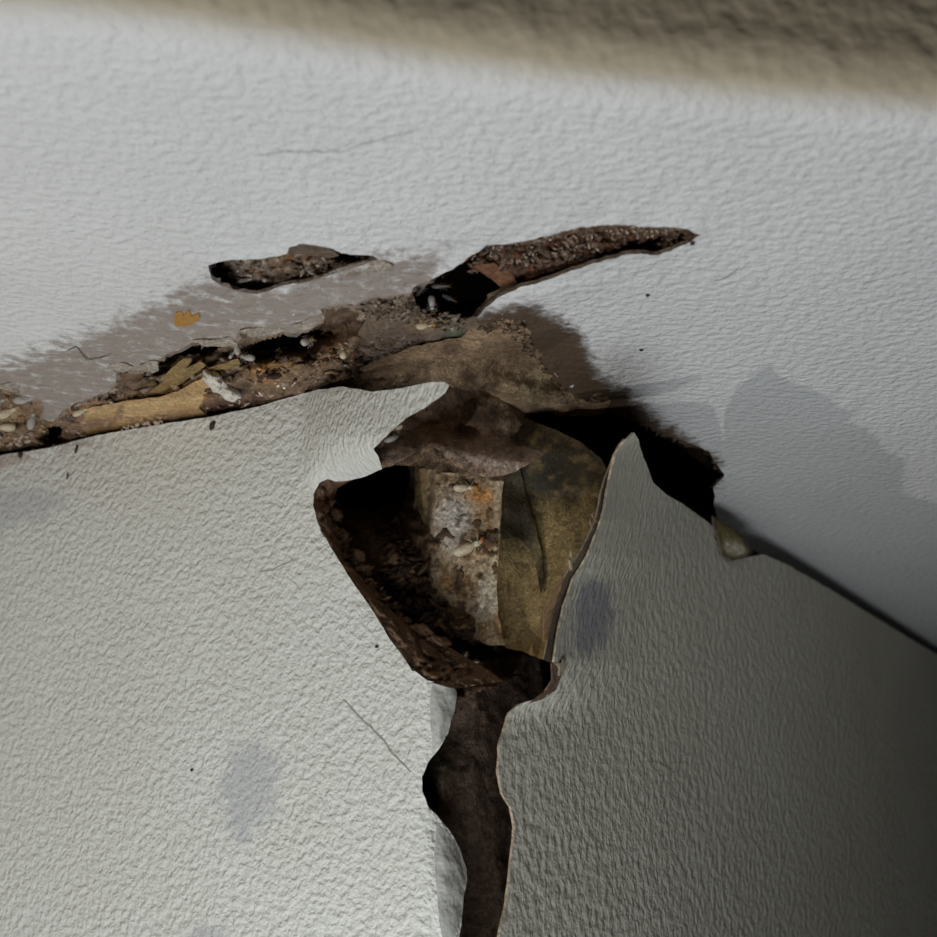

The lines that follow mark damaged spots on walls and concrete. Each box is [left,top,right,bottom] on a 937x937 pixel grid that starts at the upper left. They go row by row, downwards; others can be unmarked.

spalling [209,244,394,290]
spalling [414,224,696,322]
peeling [174,309,200,327]
spalling [349,377,418,392]
spalling [590,433,615,469]
spalling [636,422,724,483]
spalling [679,495,718,526]
spalling [313,385,534,699]
crack [343,655,545,937]